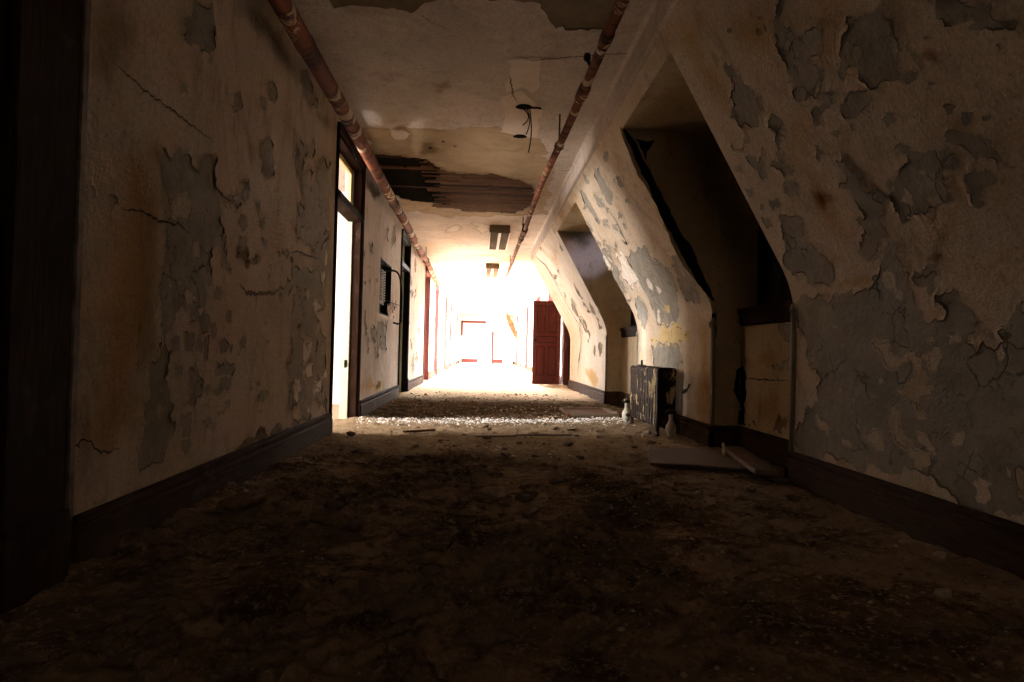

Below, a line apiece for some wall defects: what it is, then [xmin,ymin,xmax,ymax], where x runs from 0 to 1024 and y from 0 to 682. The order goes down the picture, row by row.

crack [113,62,214,142]
peeling [177,0,218,63]
flaking render [329,0,437,15]
flaking render [484,0,629,32]
peeling [756,0,919,130]
peeling [936,0,1023,40]
flaking render [361,125,555,218]
crack [123,208,189,233]
peeling [136,135,293,478]
peeling [564,283,603,357]
flaking render [580,127,719,372]
peeling [723,58,1024,517]